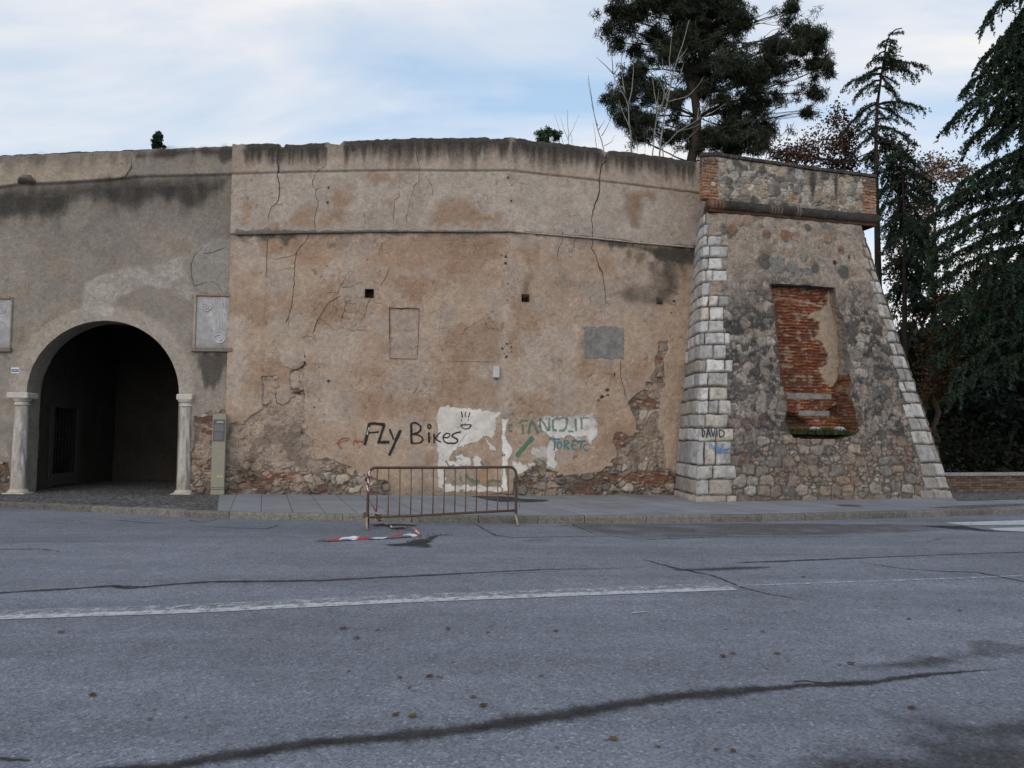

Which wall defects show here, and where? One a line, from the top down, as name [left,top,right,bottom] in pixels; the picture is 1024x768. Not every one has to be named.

leakage [0,181,222,214]
crack [262,154,420,408]
leakage [345,137,695,175]
crack [557,154,607,313]
leakage [198,352,227,388]
spalling [189,363,391,495]
spalling [437,341,675,496]